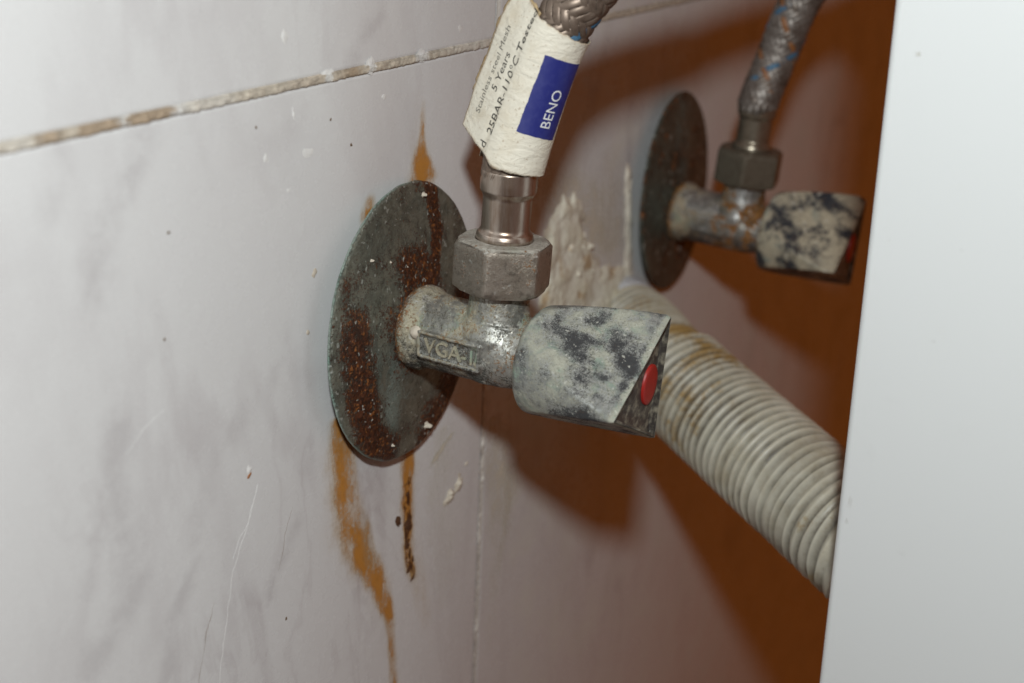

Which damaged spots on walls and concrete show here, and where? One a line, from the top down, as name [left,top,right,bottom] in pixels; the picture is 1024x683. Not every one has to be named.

rust [412,124,434,181]
rust [332,418,394,658]
rust [395,449,416,583]